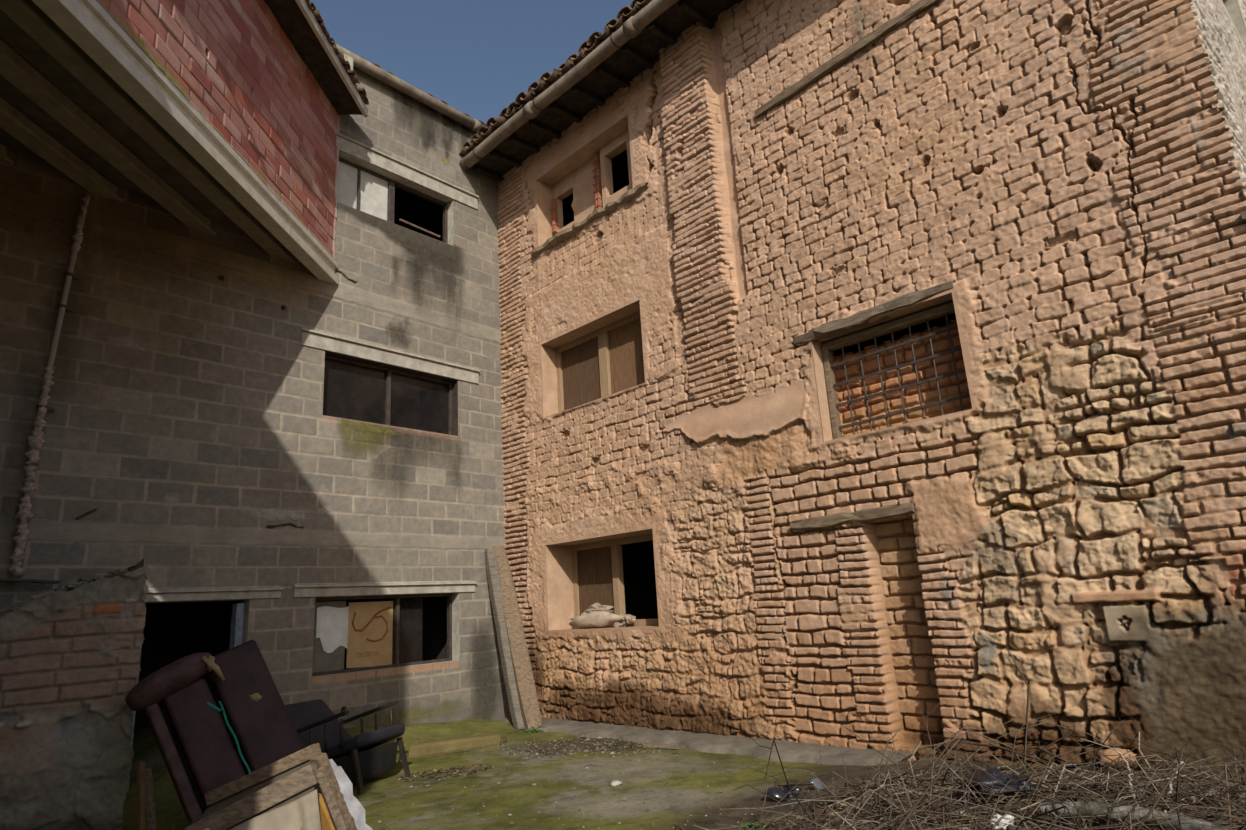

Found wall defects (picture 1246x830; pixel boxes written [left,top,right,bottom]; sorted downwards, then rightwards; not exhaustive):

crack [1070,0,1148,278]
peeling [661,379,810,444]
damp [1106,607,1235,761]